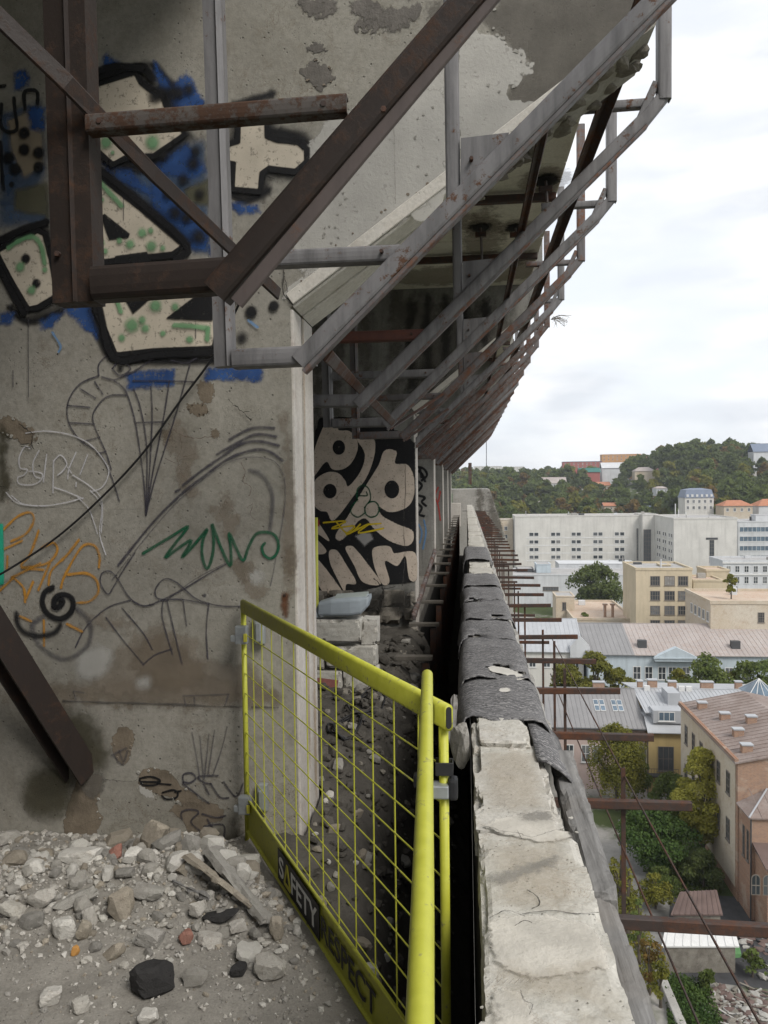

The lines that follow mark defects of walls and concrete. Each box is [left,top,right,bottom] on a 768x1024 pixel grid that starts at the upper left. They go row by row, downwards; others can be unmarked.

spalling [295,0,422,38]
spalling [299,42,336,92]
spalling [547,44,650,138]
spalling [499,146,534,181]
peeling [111,727,135,765]
spalling [450,722,471,770]
peeling [136,768,224,833]
crack [489,890,599,925]